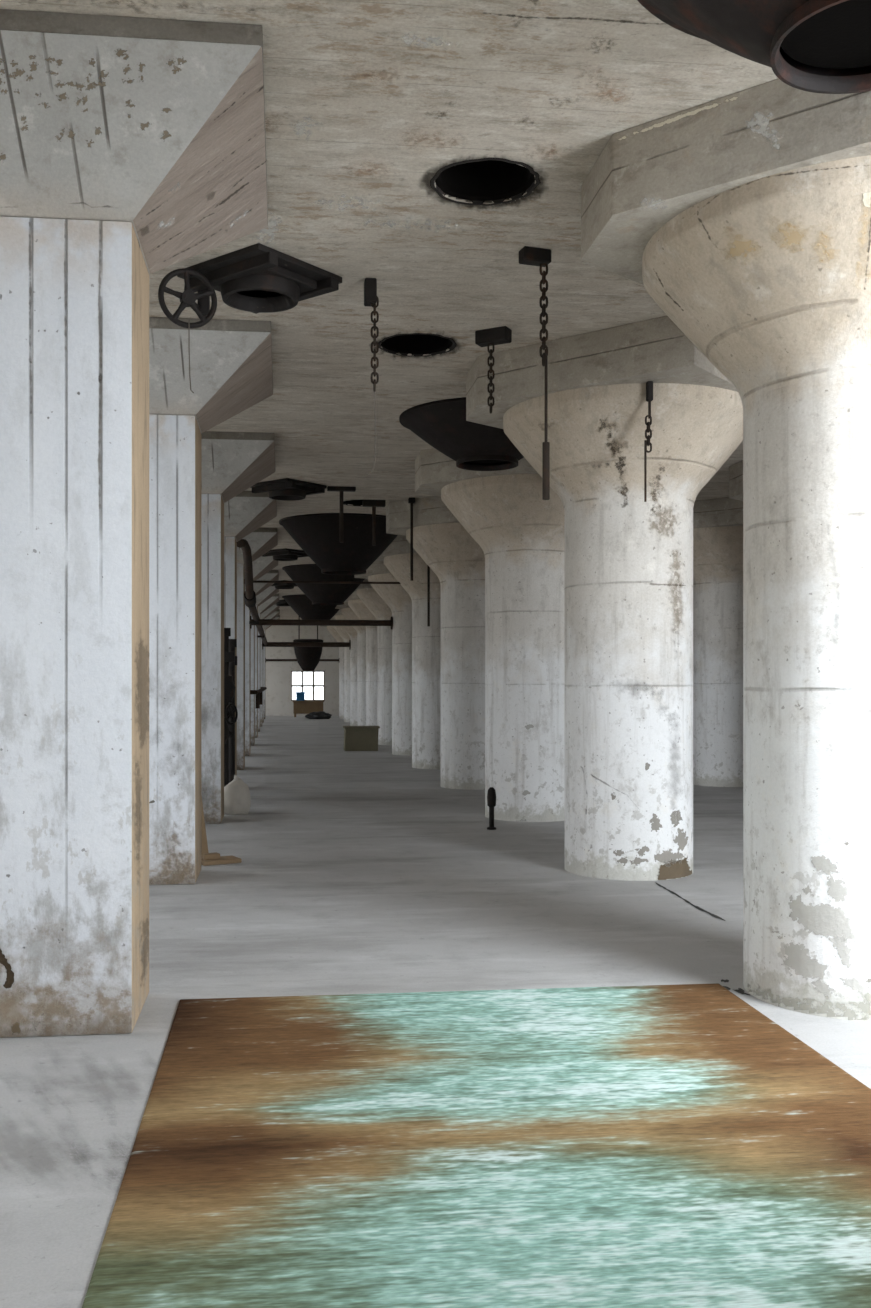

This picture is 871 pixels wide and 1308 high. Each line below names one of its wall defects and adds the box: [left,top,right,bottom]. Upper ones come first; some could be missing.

peeling [613,810,692,880]
peeling [772,855,871,996]
spalling [0,949,14,988]